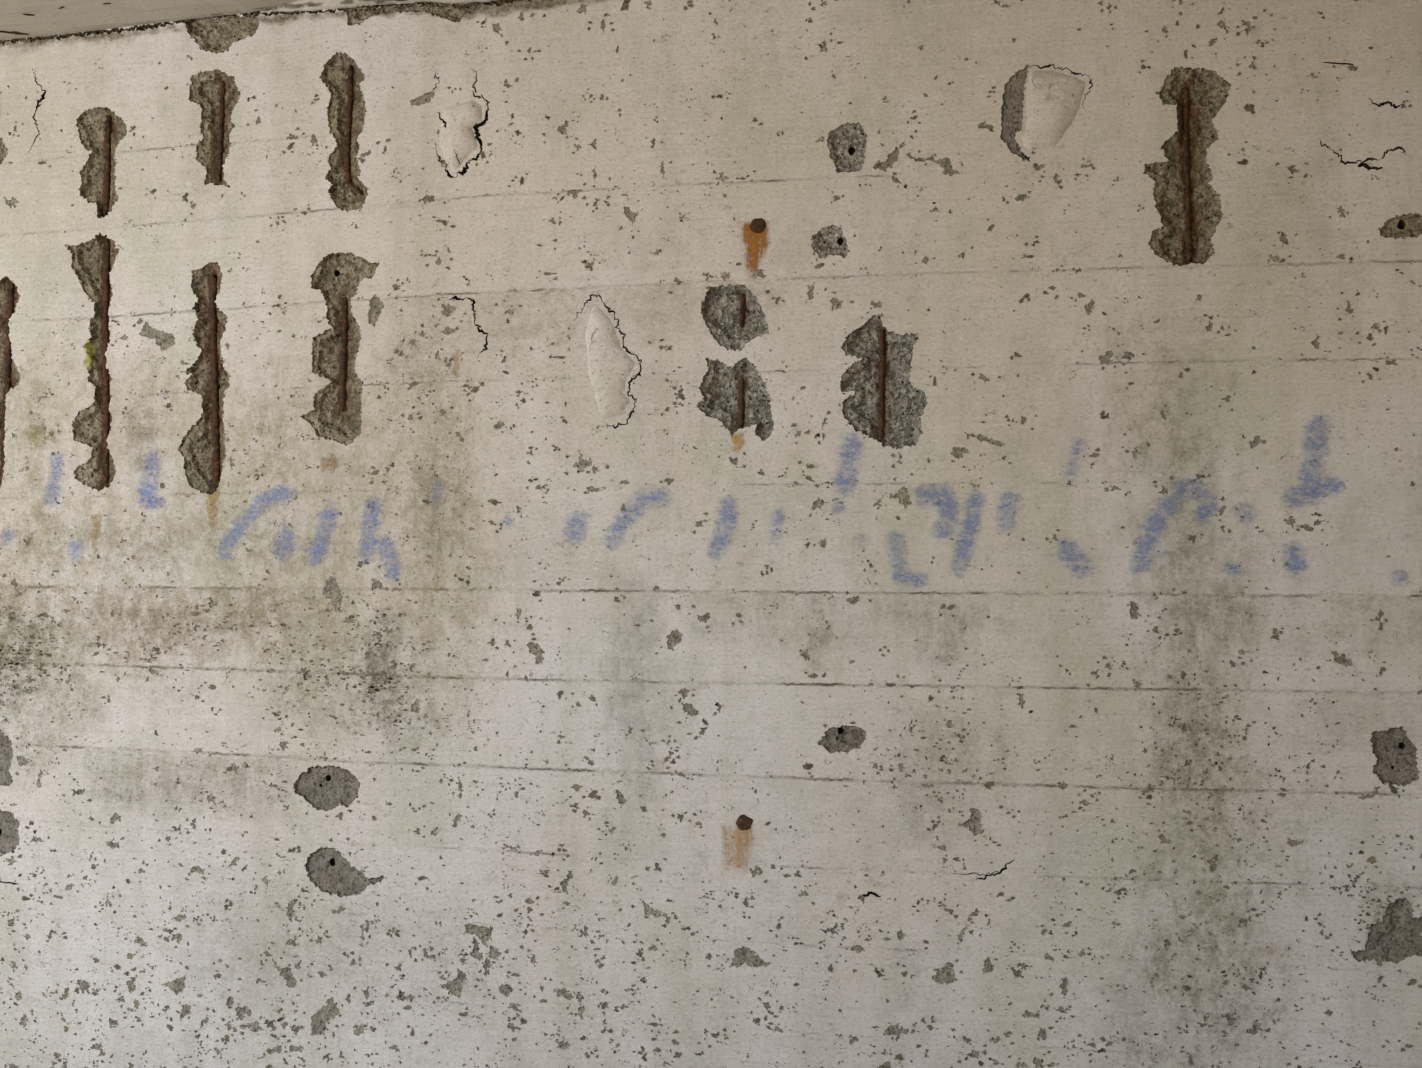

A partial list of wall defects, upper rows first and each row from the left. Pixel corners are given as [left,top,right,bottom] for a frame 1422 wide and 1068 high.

spalling [141,13,277,200]
crack [433,70,490,178]
rust [743,218,767,272]
peeling [959,58,1095,212]
spalling [1137,0,1276,269]
peeling [1275,162,1312,184]
peeling [1300,36,1393,101]
crack [573,294,642,429]
spalling [624,225,1037,578]
spalling [0,52,929,1068]
peeling [1153,452,1269,625]
rust [724,815,753,867]